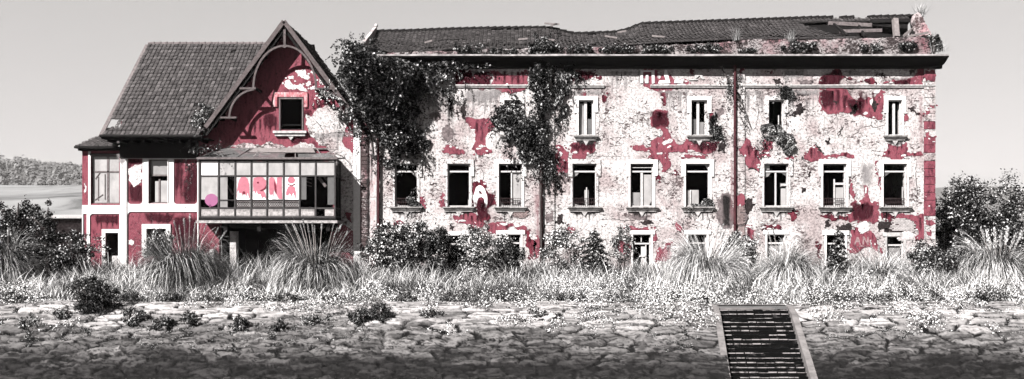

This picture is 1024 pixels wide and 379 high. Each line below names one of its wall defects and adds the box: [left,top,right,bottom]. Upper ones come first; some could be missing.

spalling [128,164,142,187]
spalling [226,69,361,231]
peeling [430,98,495,158]
peeling [420,179,545,260]
peeling [630,69,773,183]
peeling [784,138,854,193]
peeling [789,69,938,121]
peeling [820,130,937,254]